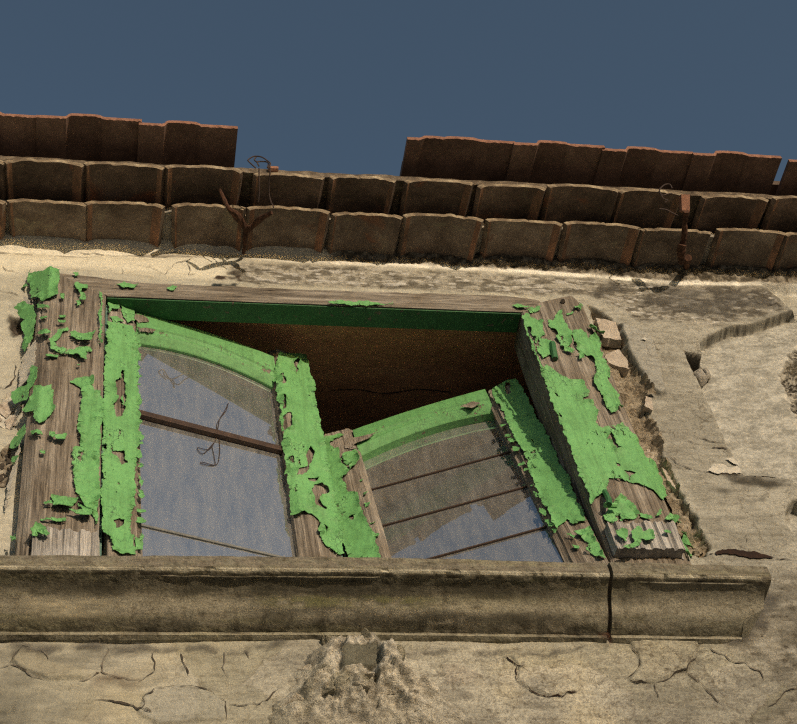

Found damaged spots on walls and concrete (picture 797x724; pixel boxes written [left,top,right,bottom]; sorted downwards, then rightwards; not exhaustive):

peeling [0,266,155,554]
peeling [272,352,381,558]
peeling [488,302,709,559]
flaking render [707,457,742,474]
crack [4,645,49,680]
crack [80,648,278,718]
crack [502,656,577,697]
crack [628,645,764,704]